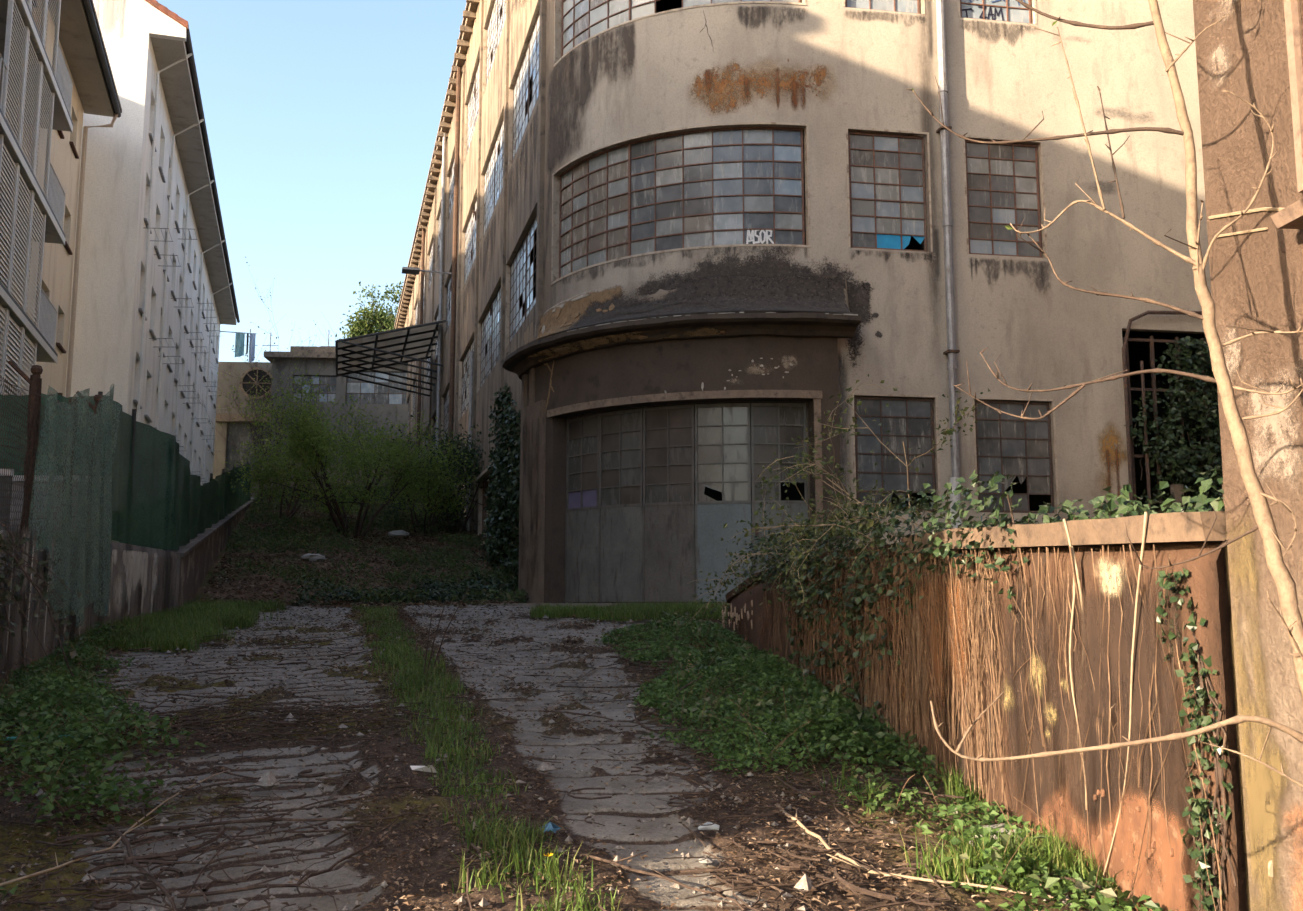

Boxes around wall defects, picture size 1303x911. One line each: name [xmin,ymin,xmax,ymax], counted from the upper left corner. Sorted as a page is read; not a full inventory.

water stain [964,21,1035,43]
water stain [463,24,635,328]
water stain [971,259,1049,290]
water stain [520,246,882,544]
corrosion [1100,426,1127,496]